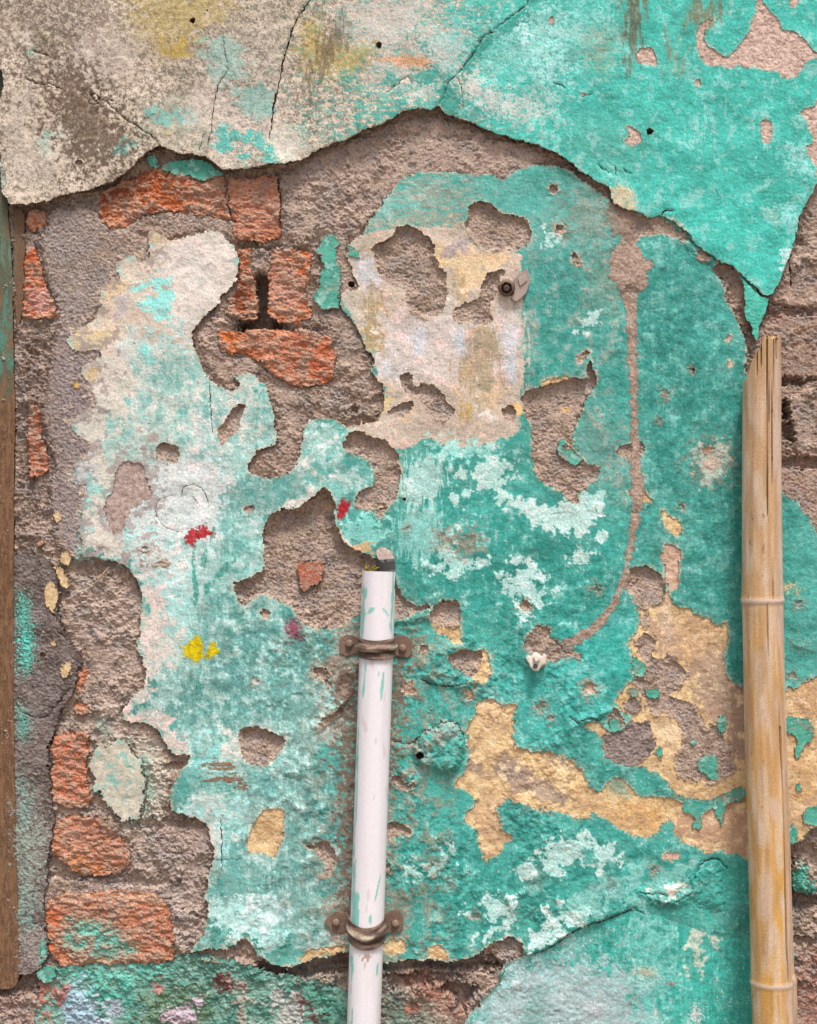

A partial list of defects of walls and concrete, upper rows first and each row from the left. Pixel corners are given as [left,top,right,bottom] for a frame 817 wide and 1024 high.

crack [199,41,228,151]
crack [269,0,310,139]
peeling [696,0,817,79]
flaking render [0,107,688,1024]
peeling [394,490,748,862]
crack [529,858,727,955]